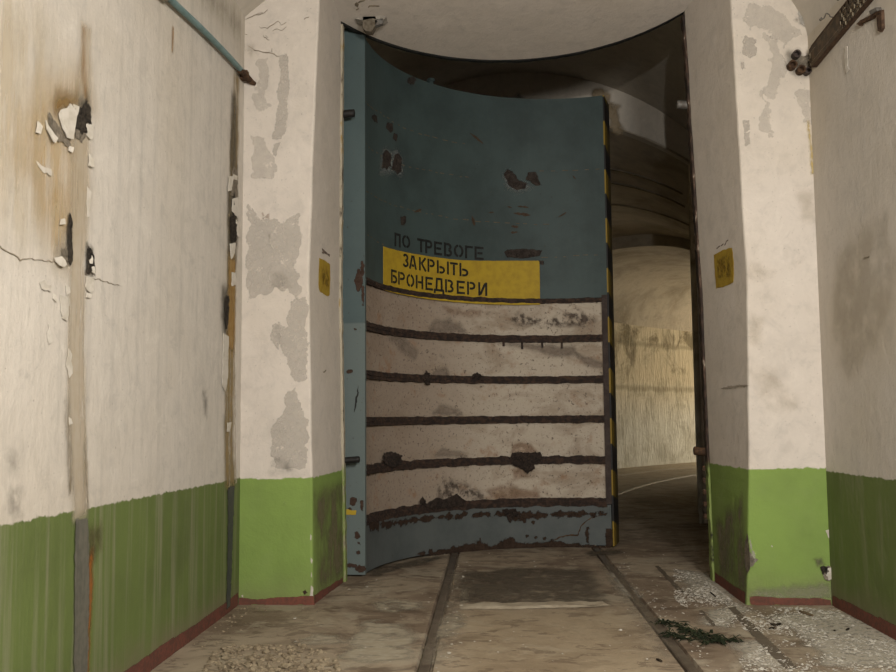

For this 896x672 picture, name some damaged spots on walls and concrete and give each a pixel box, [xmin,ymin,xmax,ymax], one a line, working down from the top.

spalling [35,94,93,267]
crack [0,246,55,262]
spalling [85,244,96,298]
corrosion [347,510,613,573]